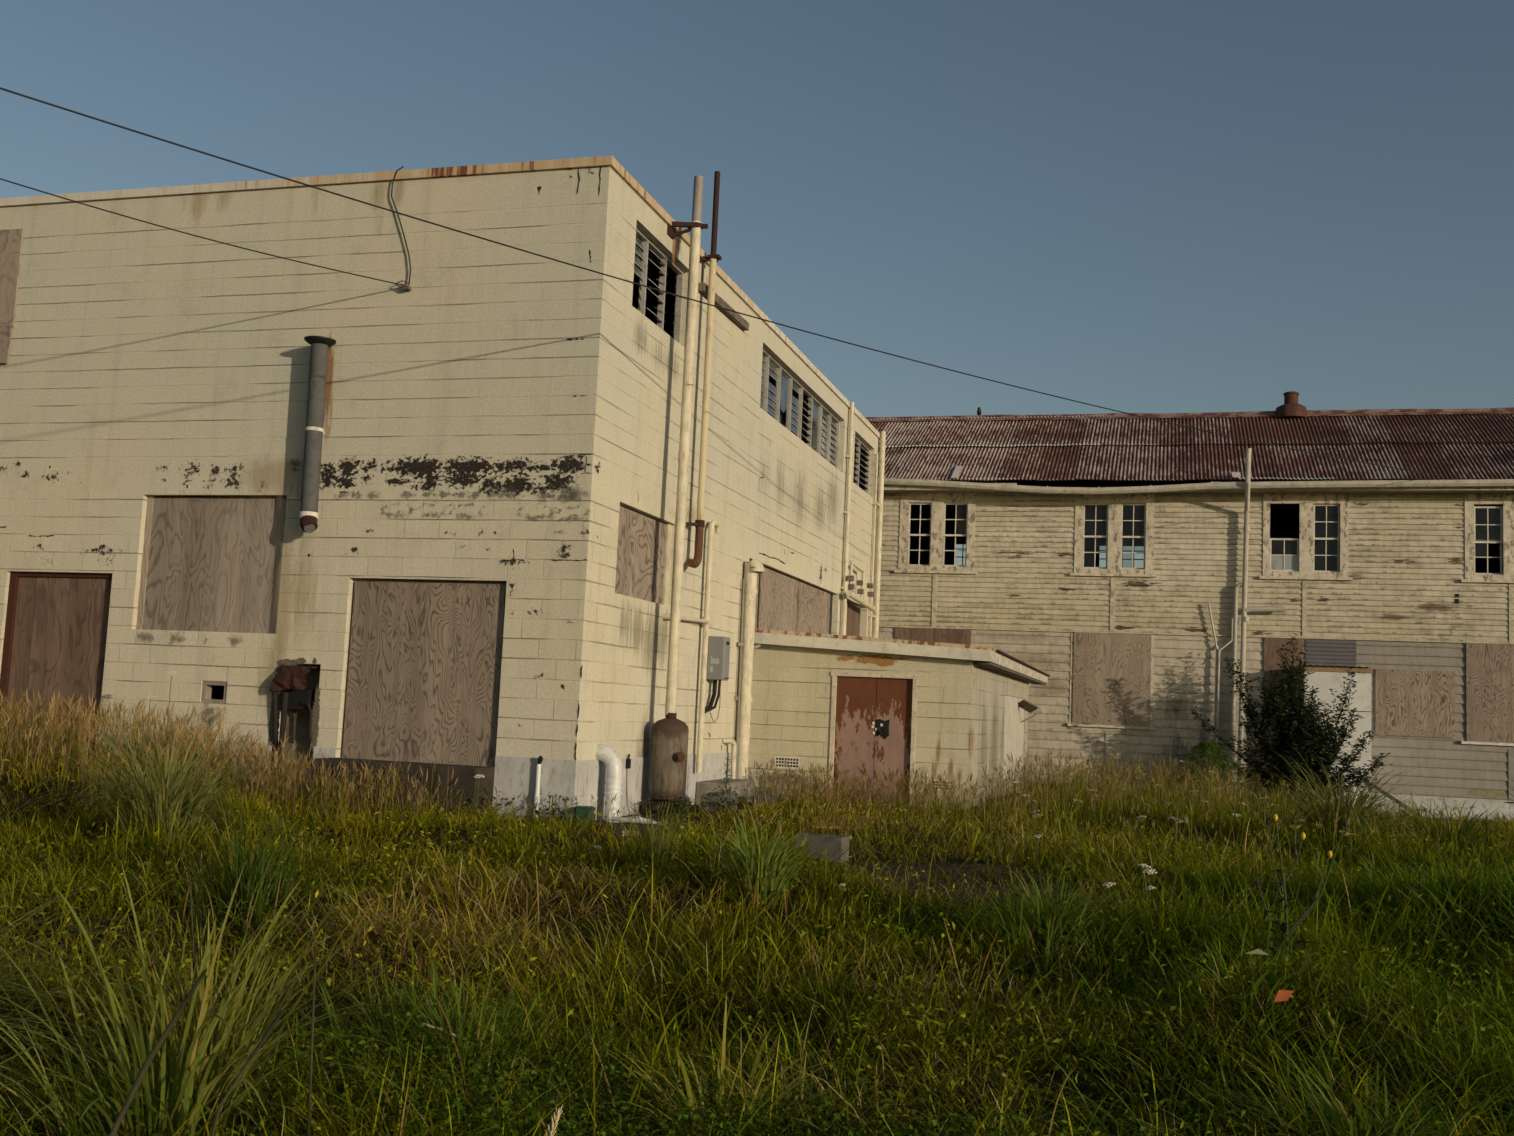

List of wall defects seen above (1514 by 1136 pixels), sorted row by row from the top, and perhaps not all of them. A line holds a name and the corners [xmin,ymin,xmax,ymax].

peeling [319,454,590,497]